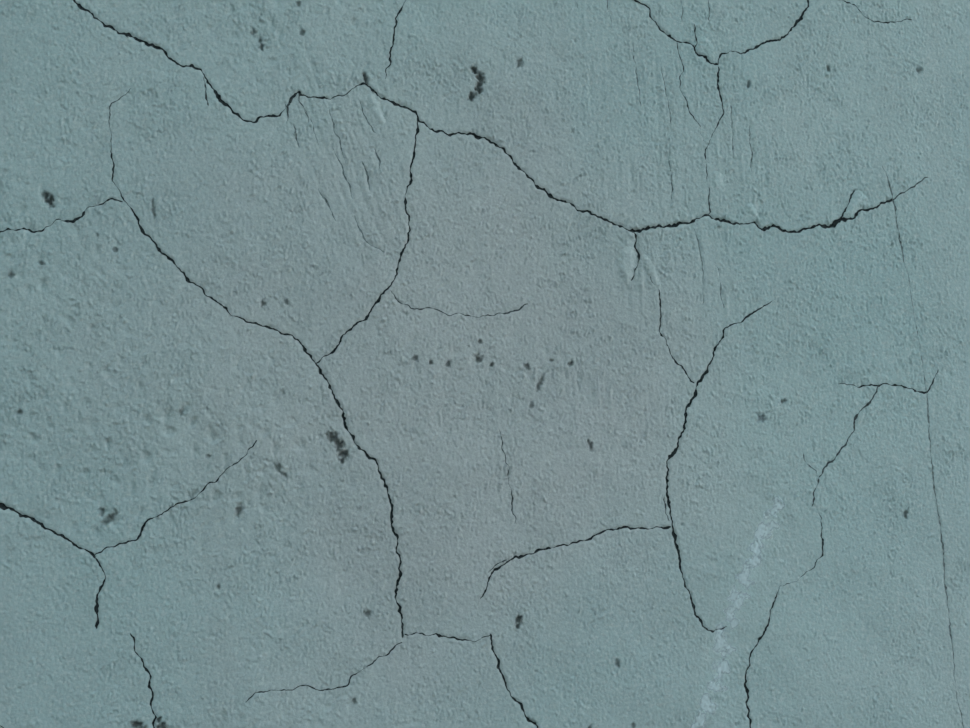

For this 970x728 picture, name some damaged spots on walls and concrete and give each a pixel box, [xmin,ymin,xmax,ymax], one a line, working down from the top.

crack [73,0,328,123]
crack [385,0,406,79]
crack [634,0,809,176]
crack [842,0,912,24]
crack [0,123,232,316]
crack [235,75,928,728]
crack [0,440,257,629]
crack [803,356,964,728]
crack [130,633,157,728]